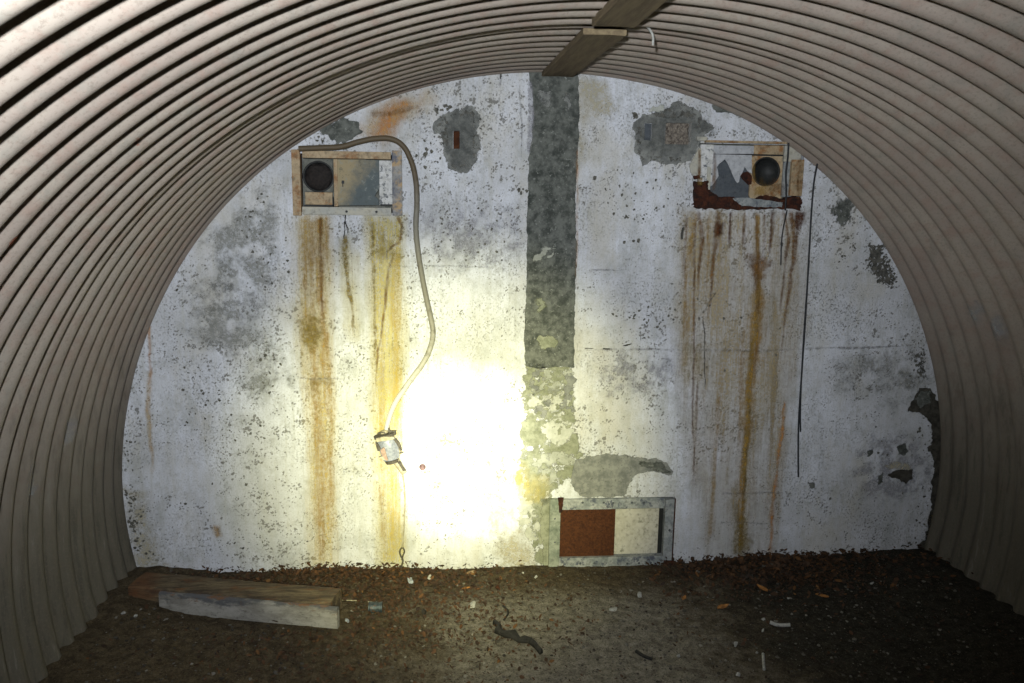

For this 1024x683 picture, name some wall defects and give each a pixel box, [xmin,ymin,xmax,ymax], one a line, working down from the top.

corrosion [301,219,332,541]
spalling [315,117,363,151]
corrosion [368,218,402,434]
spalling [412,104,482,174]
peeling [515,72,682,565]
spalling [593,101,740,222]
corrosion [683,154,804,556]
peeling [831,198,900,289]
spalling [867,340,941,549]